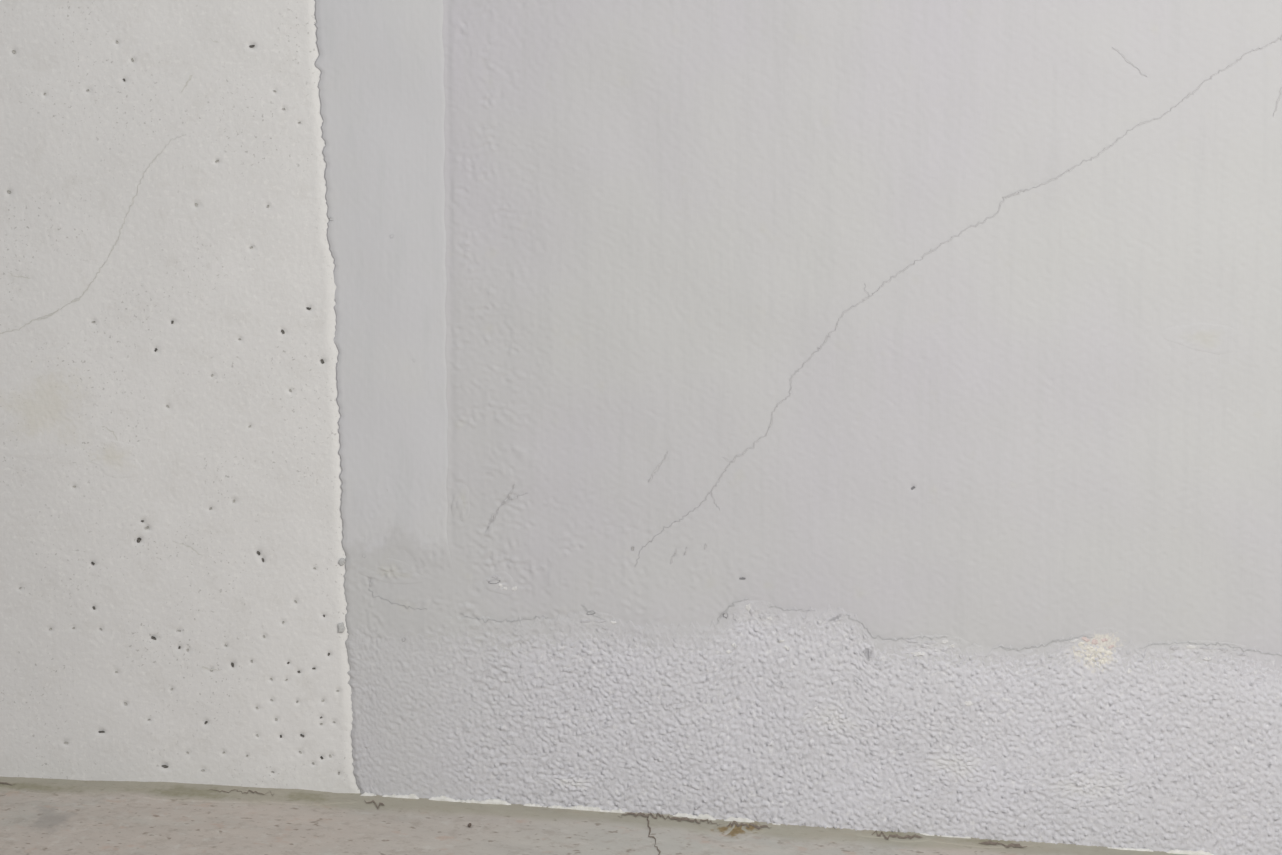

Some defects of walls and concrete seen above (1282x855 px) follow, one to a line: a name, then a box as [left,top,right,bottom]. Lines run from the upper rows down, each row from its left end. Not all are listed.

crack [635,35,1282,566]
peeling [360,792,625,813]
peeling [673,813,755,822]
crack [622,812,772,855]
crack [872,830,923,839]
crack [981,840,1027,848]
peeling [1107,847,1214,855]